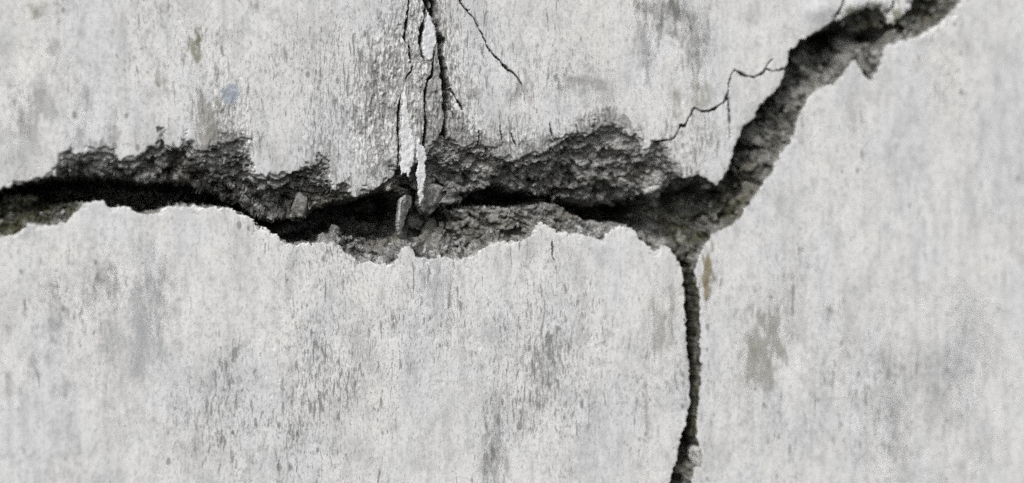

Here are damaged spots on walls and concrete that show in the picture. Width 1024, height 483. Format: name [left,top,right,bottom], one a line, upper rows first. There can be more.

spalling [0,192,97,236]
spalling [56,138,360,222]
crack [394,97,402,168]
crack [402,0,463,151]
crack [459,0,525,100]
crack [476,126,517,146]
spalling [308,86,717,265]
crack [651,97,731,145]
crack [692,0,960,234]
crack [0,175,712,483]